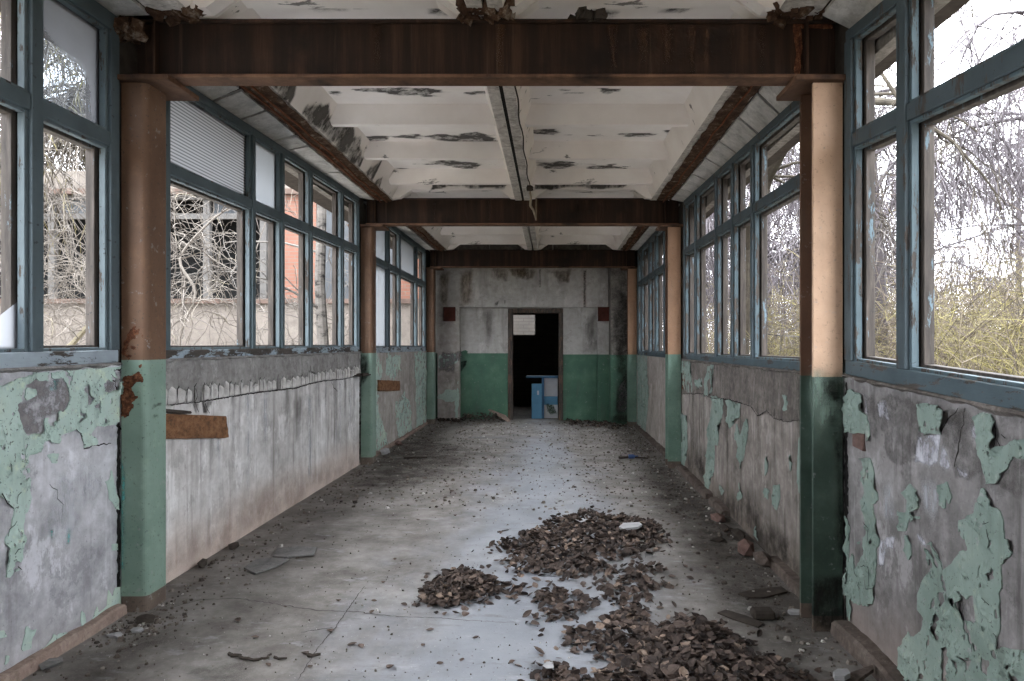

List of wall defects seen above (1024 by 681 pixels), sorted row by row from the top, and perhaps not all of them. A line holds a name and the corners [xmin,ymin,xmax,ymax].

spalling [239,86,496,203]
peeling [539,161,574,169]
spalling [657,86,761,203]
peeling [0,367,122,578]
rust [119,326,144,418]
flaking render [166,353,361,413]
peeling [376,350,468,450]
flaking render [680,361,800,495]
peeling [841,389,880,621]
peeling [916,403,943,435]
peeling [896,412,1024,681]
peeling [80,587,121,626]